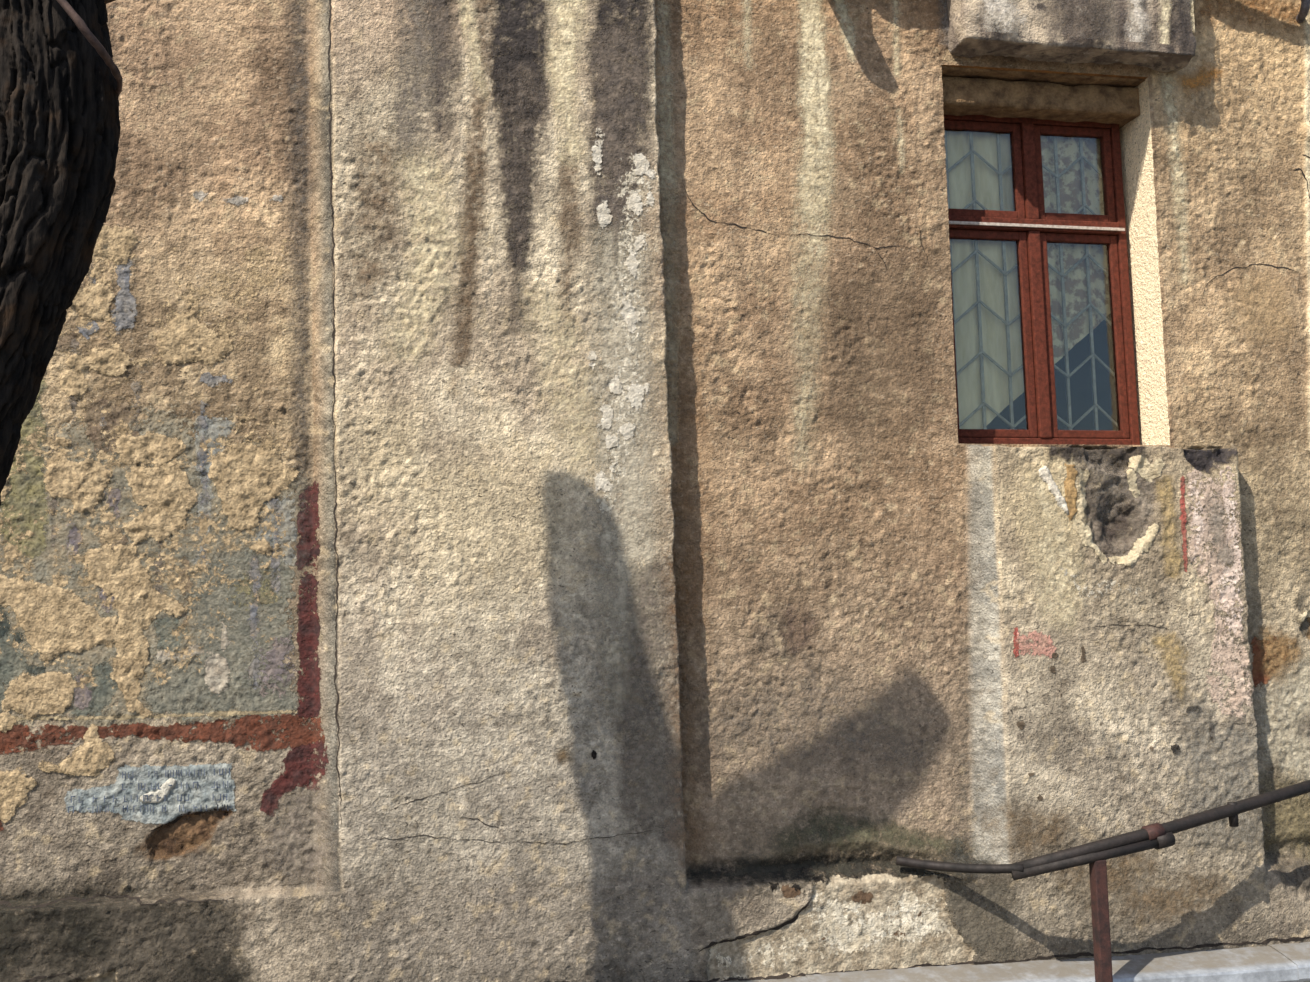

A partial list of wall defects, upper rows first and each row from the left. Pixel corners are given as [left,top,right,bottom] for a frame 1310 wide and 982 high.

leakage [354,0,678,466]
crack [682,180,929,267]
leakage [619,562,687,843]
spalling [1013,455,1165,673]
peeling [1179,466,1310,780]
leakage [0,889,247,982]
spalling [141,808,233,859]
spalling [700,873,977,982]